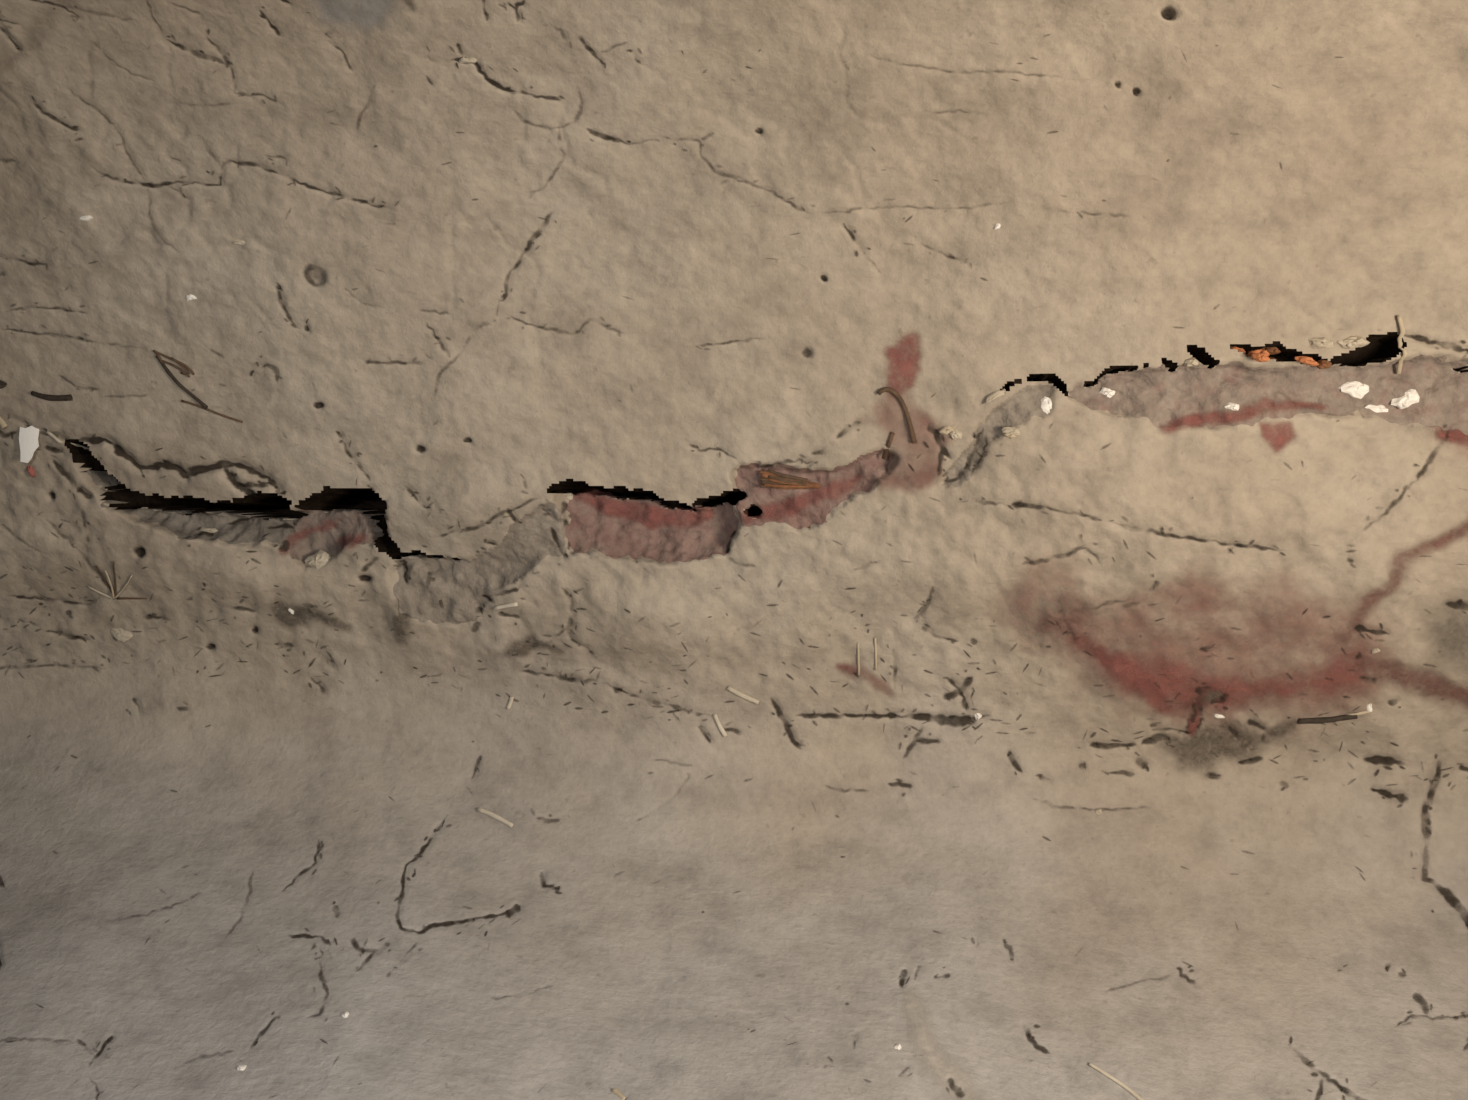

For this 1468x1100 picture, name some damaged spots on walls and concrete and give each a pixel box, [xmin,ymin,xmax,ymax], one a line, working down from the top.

crack [428,44,563,100]
crack [106,157,385,208]
spalling [939,336,1468,487]
crack [1000,332,1468,396]
spalling [85,470,384,570]
crack [0,417,859,742]
spalling [393,448,894,624]
crack [1156,527,1286,556]
crack [772,596,984,795]
crack [1080,648,1265,779]
crack [1365,755,1468,926]
crack [285,820,561,1016]